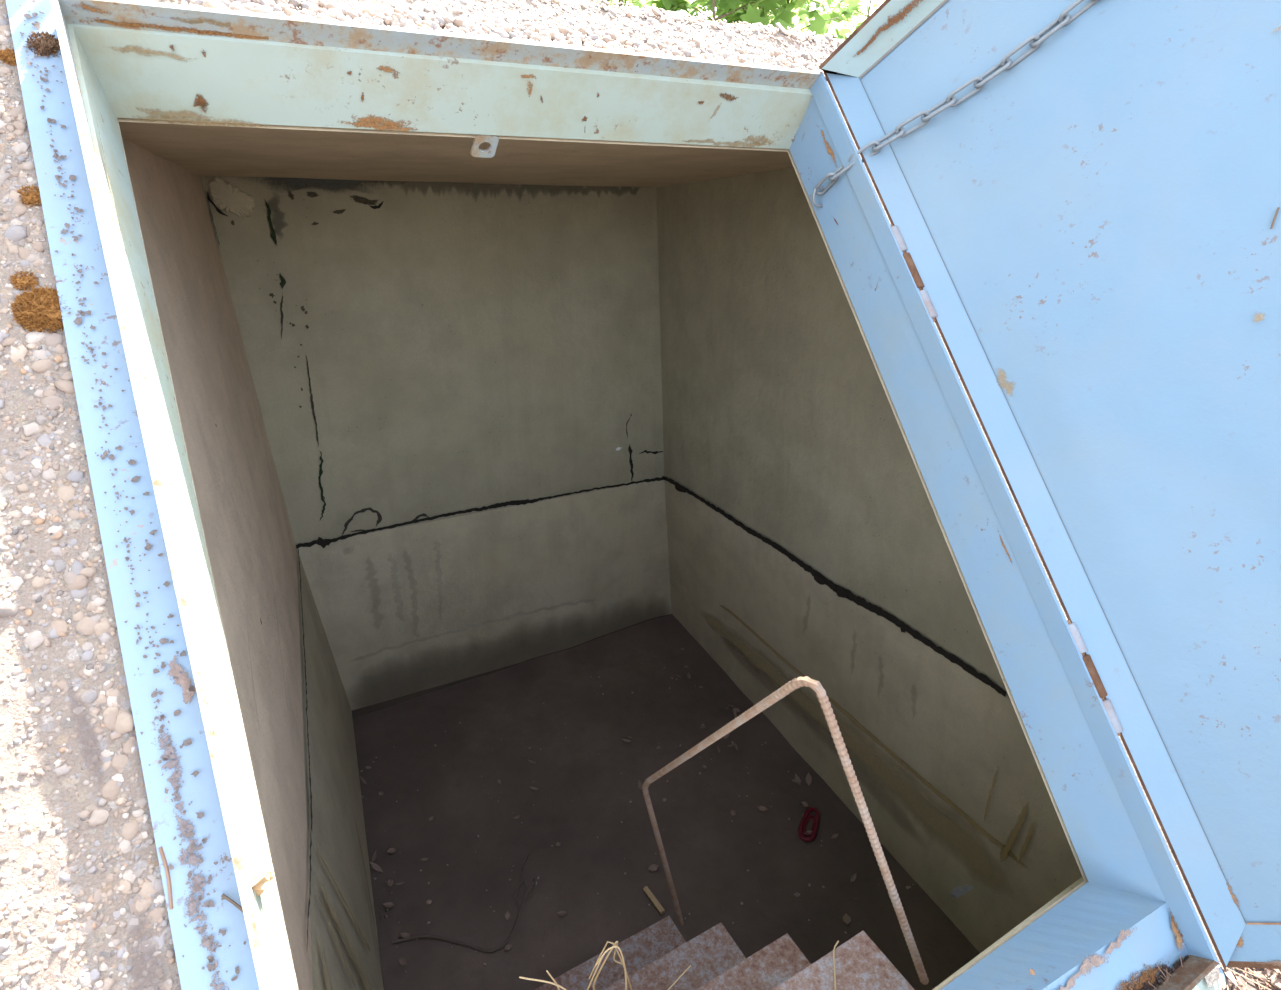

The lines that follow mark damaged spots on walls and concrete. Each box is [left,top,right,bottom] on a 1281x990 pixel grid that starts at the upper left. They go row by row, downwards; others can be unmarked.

rust [75,2,269,60]
rust [857,0,923,55]
rust [140,94,262,127]
rust [341,115,418,132]
crack [265,201,1006,946]
rust [1117,908,1189,990]